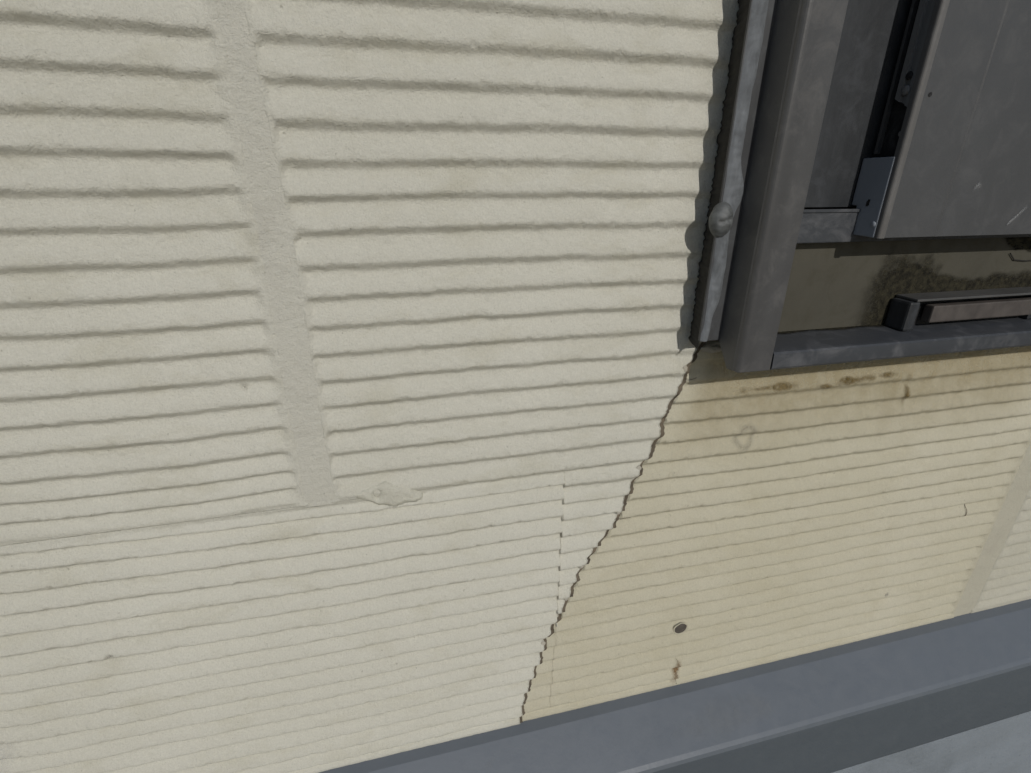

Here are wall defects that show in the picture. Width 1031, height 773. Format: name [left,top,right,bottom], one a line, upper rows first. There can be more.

crack [519,342,706,723]
damp [730,346,1031,397]